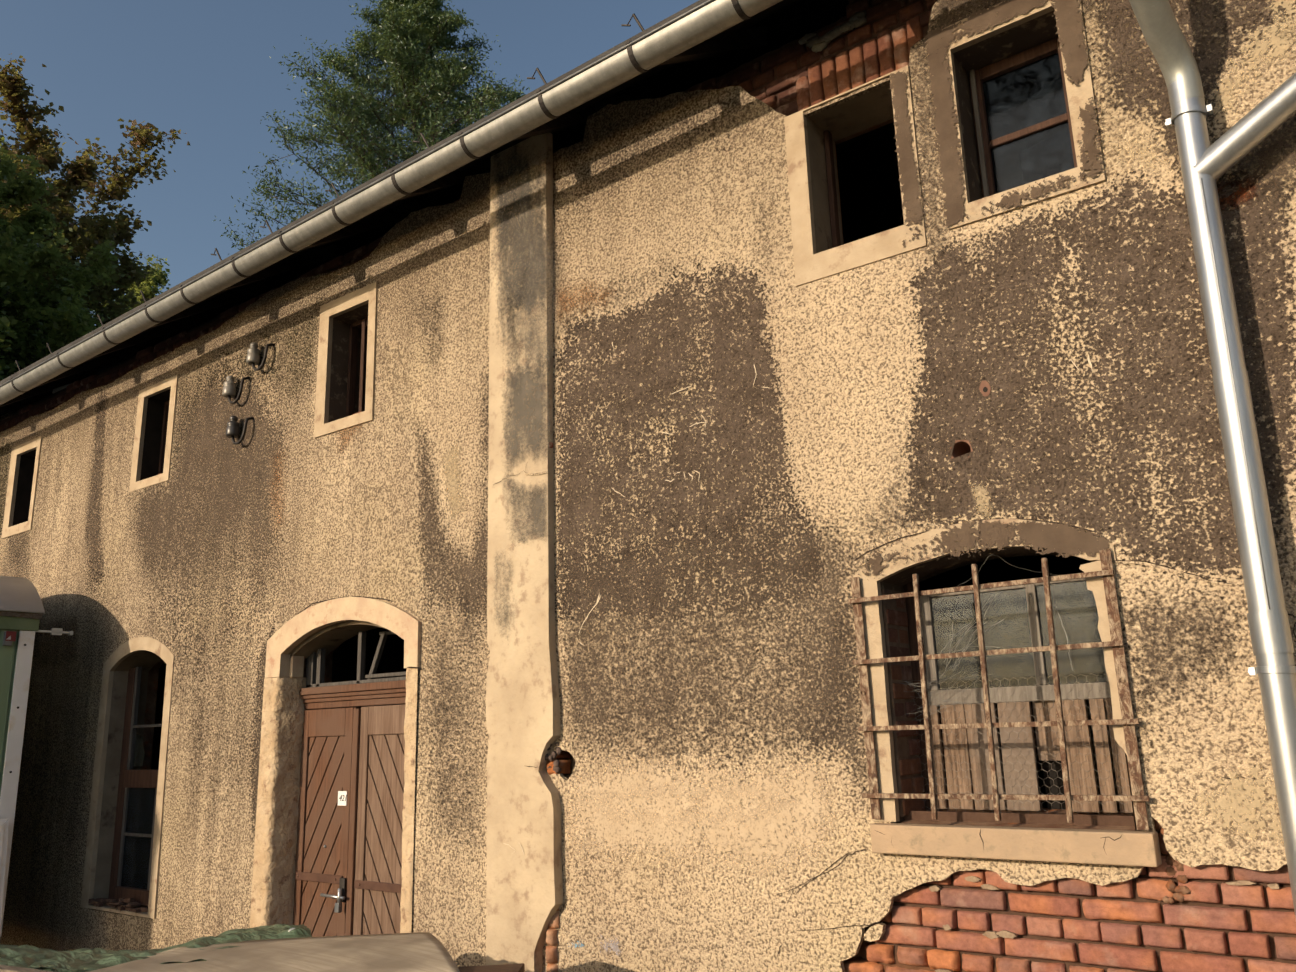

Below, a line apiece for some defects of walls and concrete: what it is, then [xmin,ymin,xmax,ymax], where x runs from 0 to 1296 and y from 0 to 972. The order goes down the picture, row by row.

flaking render [684,0,1157,247]
leakage [1168,0,1296,143]
flaking render [1215,0,1296,111]
flaking render [299,237,383,278]
flaking render [0,287,279,432]
leakage [409,0,1249,861]
leakage [1216,113,1296,580]
flaking render [545,742,836,873]
flaking render [843,811,1296,972]